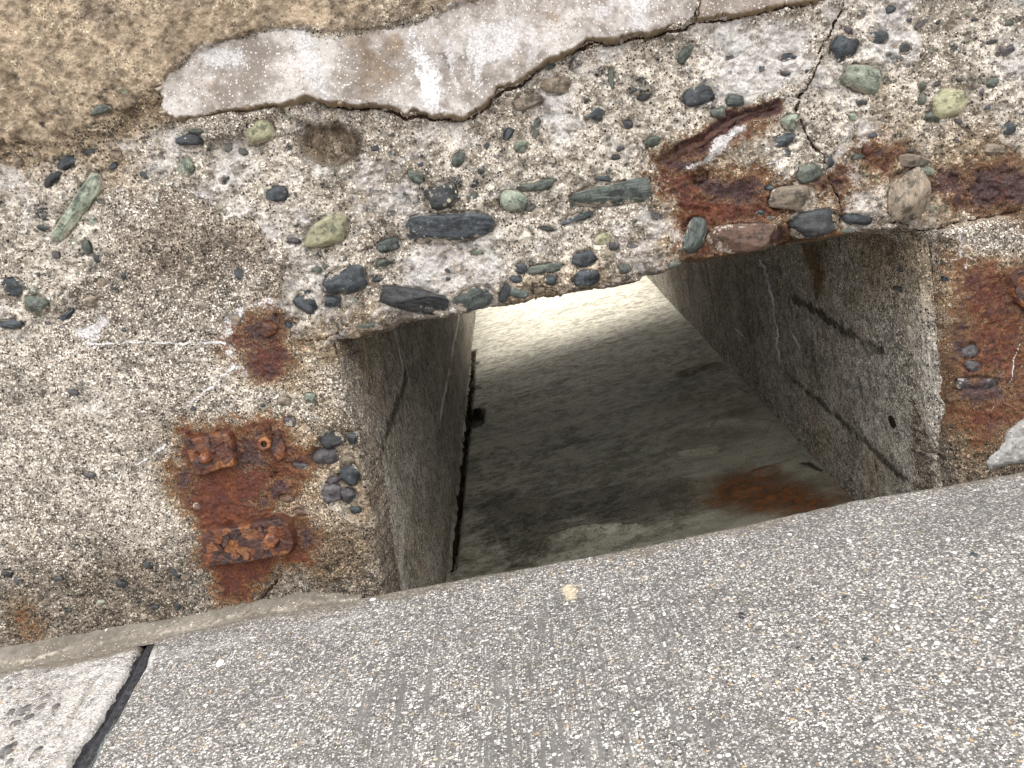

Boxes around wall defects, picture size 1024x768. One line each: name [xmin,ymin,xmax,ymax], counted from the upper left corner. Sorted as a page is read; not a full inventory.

crack [337,73,536,122]
crack [565,0,844,222]
rust [634,94,919,262]
rust [213,296,308,389]
rust [927,138,1024,463]
rust [156,408,334,609]
crack [440,314,476,573]
rust [703,466,850,515]